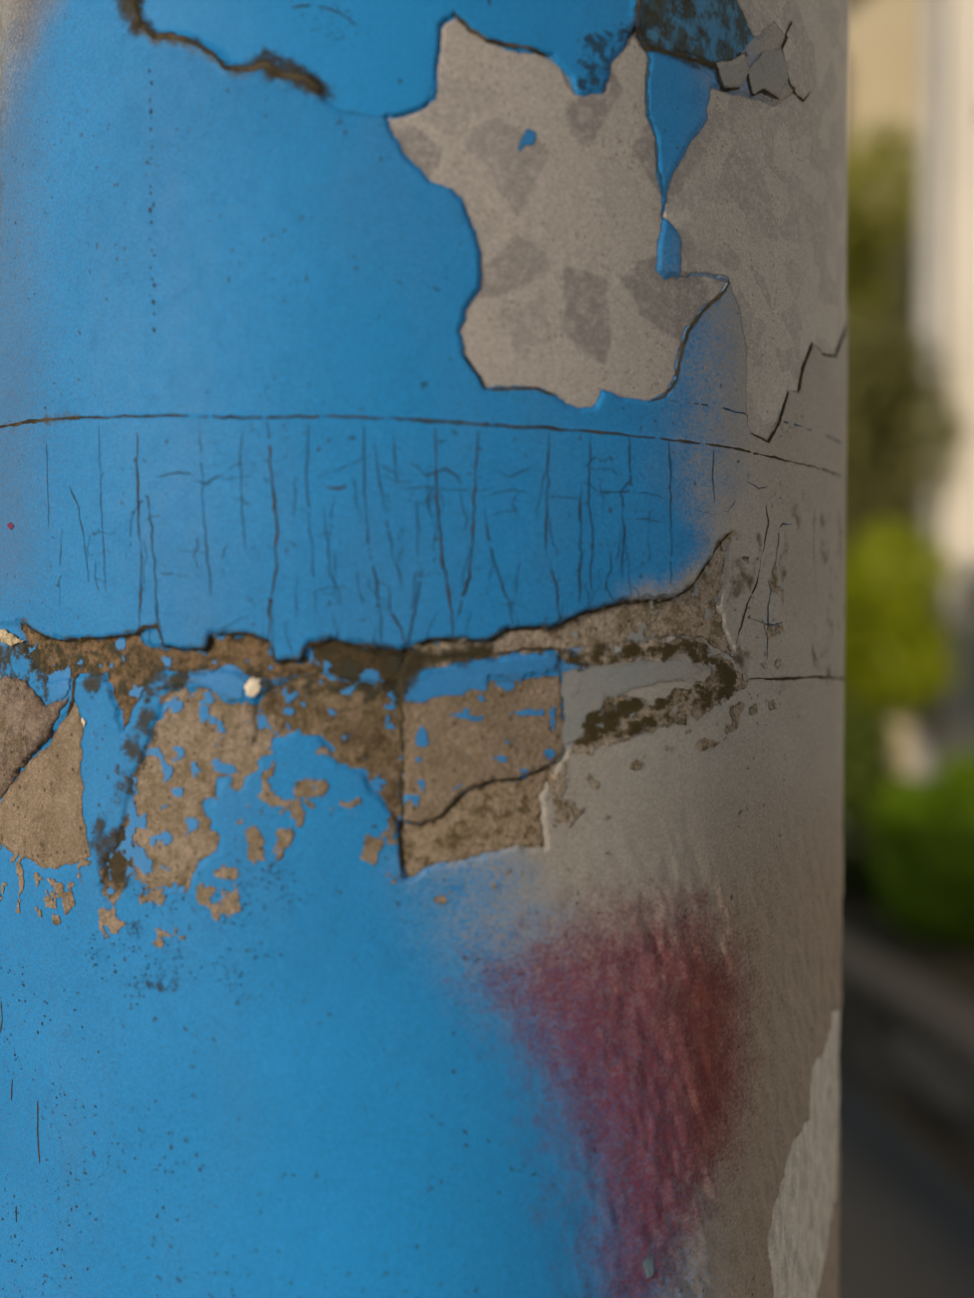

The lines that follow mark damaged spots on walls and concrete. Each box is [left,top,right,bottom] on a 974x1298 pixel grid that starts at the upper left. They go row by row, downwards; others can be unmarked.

peeling [118,0,849,443]
crack [672,401,748,417]
crack [0,414,844,717]
spalling [0,530,777,939]
peeling [152,927,185,948]
peeling [767,1009,840,1298]